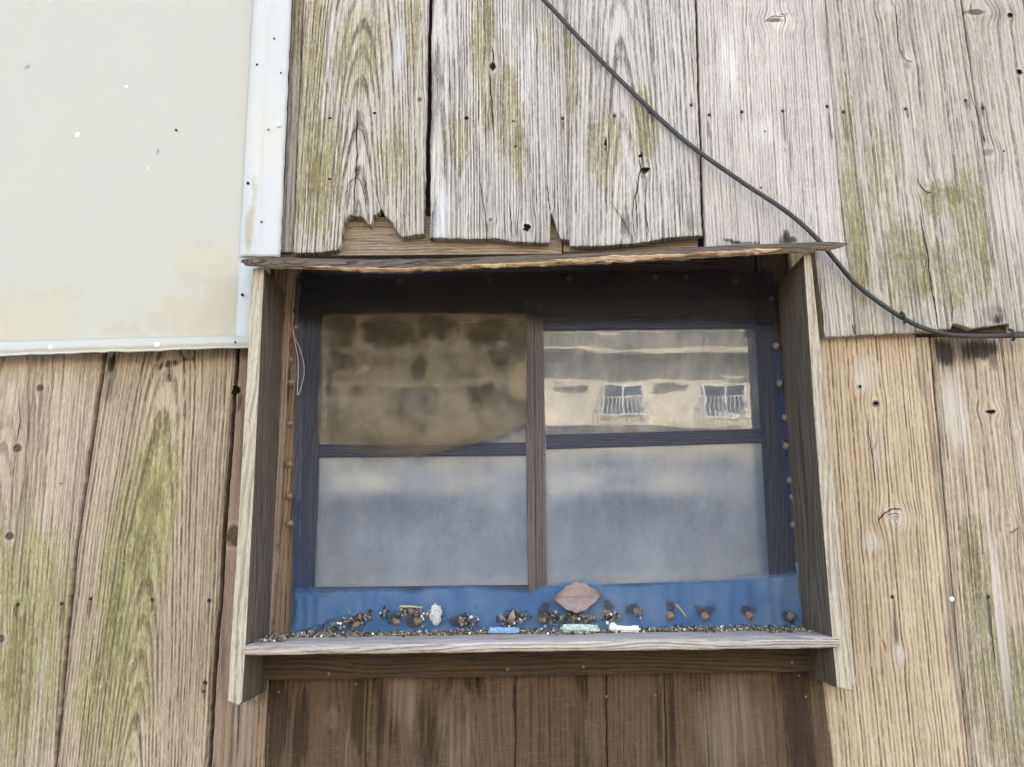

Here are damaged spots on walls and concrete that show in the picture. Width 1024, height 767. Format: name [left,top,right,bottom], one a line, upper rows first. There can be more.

crack [343,108,380,214]
crack [611,152,649,239]